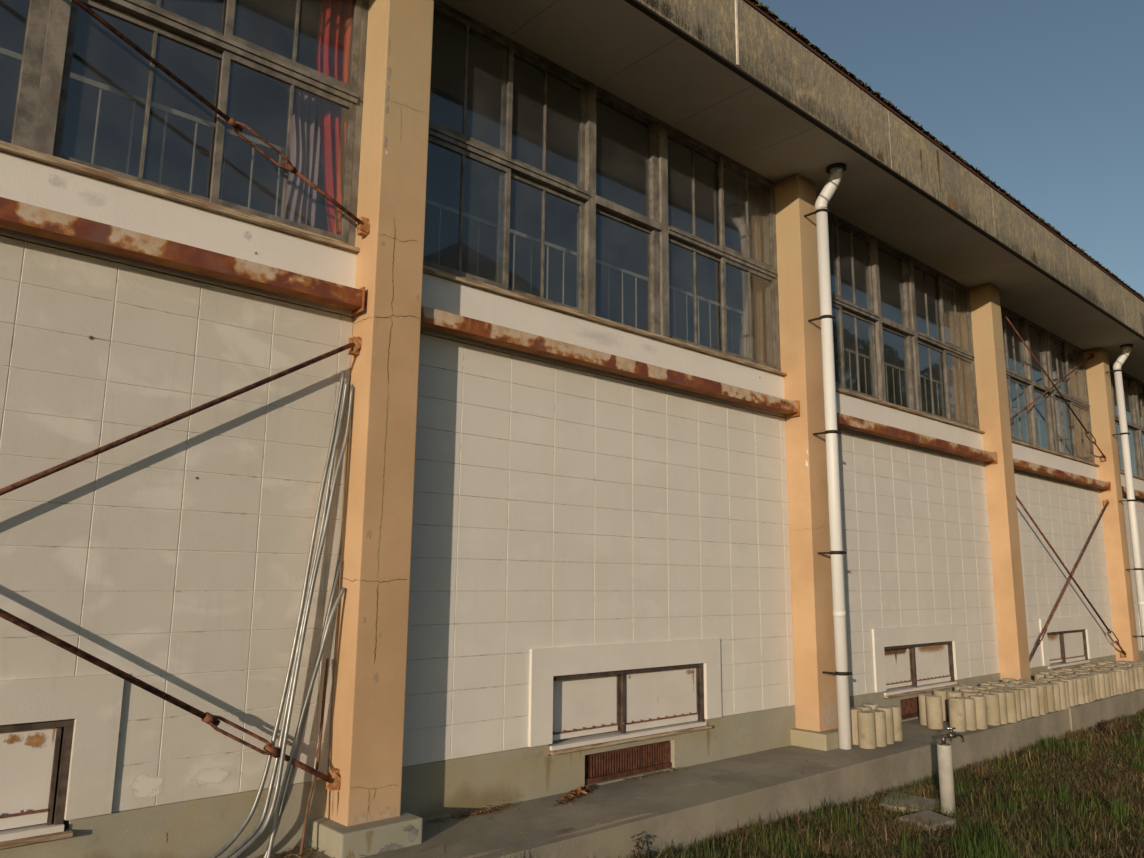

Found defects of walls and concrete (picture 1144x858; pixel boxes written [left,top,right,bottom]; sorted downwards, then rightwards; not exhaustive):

crack [342,222,418,661]
rust [4,729,55,747]